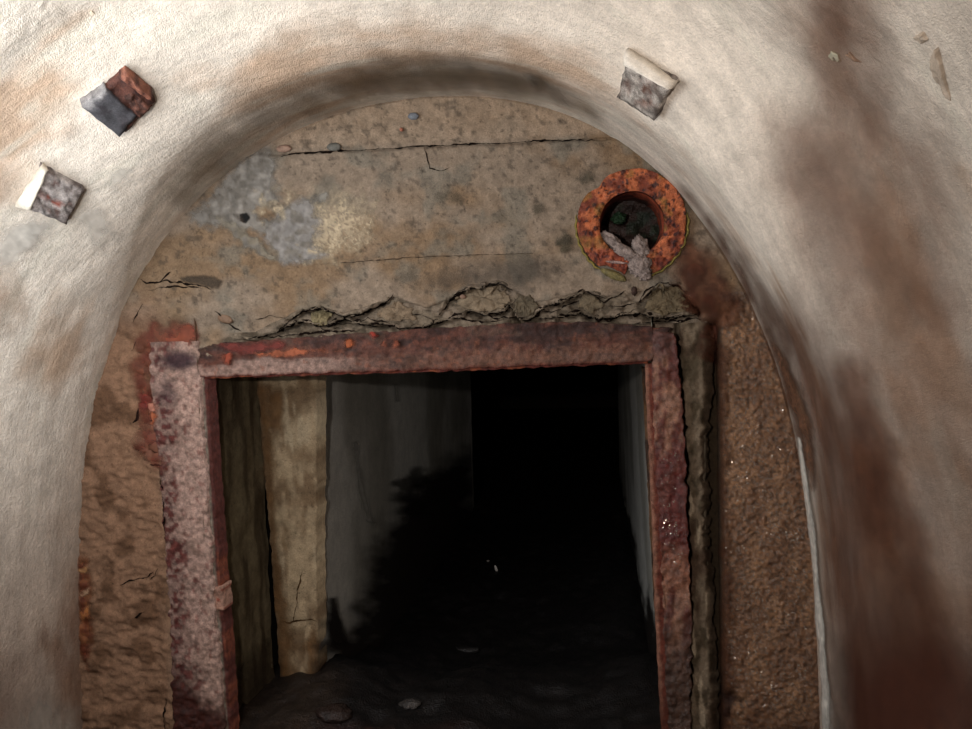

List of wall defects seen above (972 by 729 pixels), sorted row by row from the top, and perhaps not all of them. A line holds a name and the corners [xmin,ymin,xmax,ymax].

crack [273,139,614,171]
crack [315,253,531,265]
crack [133,272,703,348]
corrosion [218,341,308,364]
corrosion [131,322,198,465]
water stain [705,218,972,729]
corrosion [274,578,292,677]